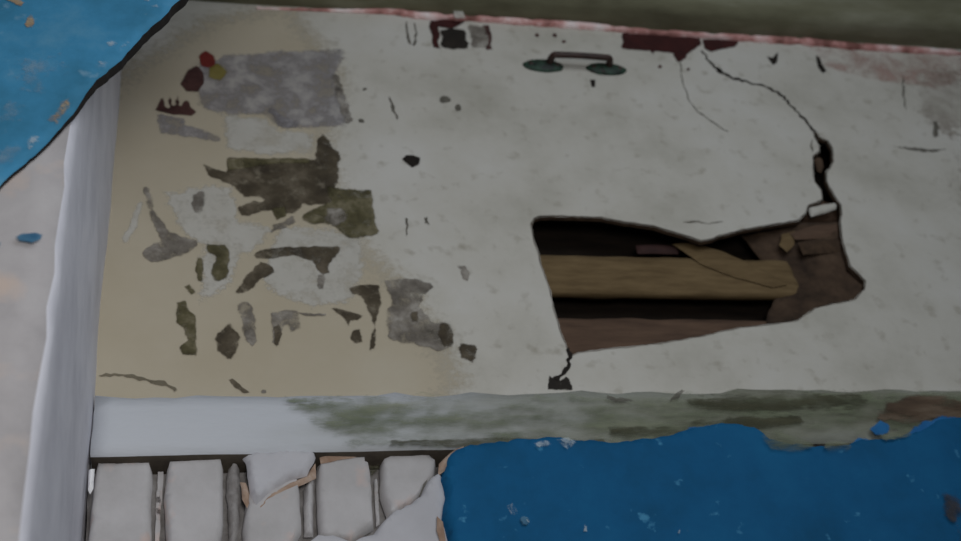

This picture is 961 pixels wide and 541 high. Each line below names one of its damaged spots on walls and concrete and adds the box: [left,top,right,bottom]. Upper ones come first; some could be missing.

peeling [257,6,961,73]
peeling [156,50,379,238]
peeling [403,155,420,167]
crack [679,62,728,132]
crack [701,50,816,151]
peeling [142,187,230,355]
peeling [215,246,340,359]
peeling [271,279,477,361]
hole [531,132,866,346]
crack [548,348,573,390]
mould [572,392,961,443]
flaking render [88,451,435,541]